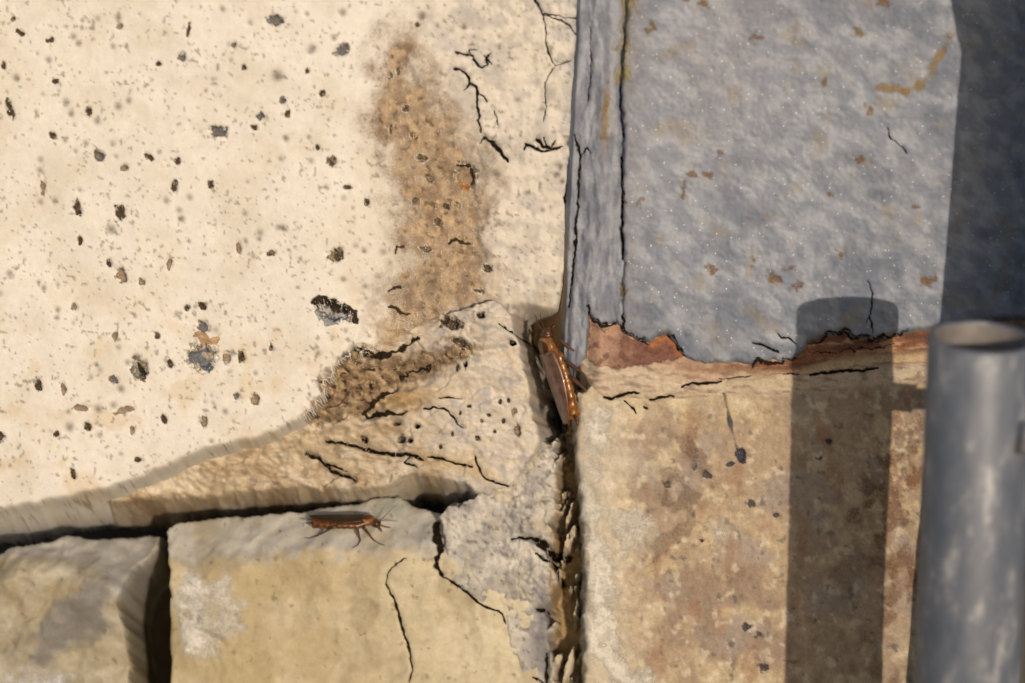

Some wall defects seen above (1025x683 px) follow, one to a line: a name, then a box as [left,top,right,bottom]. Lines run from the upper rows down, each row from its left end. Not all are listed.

crack [453,0,592,308]
crack [618,28,626,260]
spalling [305,39,493,443]
hole [480,398,521,437]
crack [385,558,413,683]
crack [432,521,506,624]
crack [532,653,549,683]